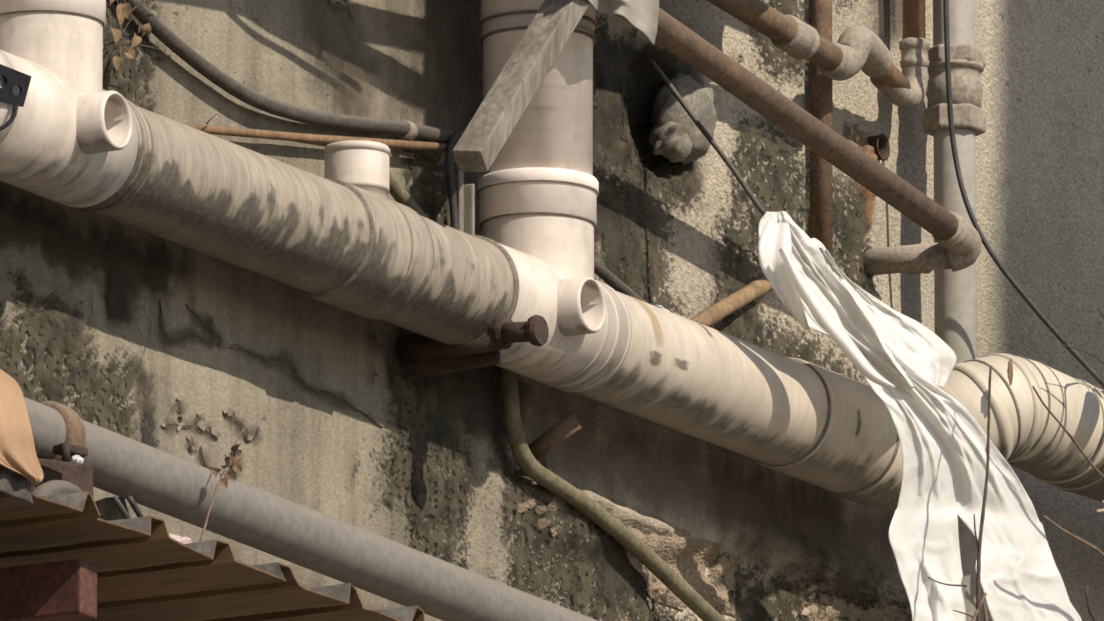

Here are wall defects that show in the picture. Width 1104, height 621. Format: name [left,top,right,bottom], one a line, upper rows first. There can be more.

damp [103,0,171,113]
damp [0,262,160,448]
crack [135,298,385,427]
damp [356,344,698,621]
damp [540,427,910,621]